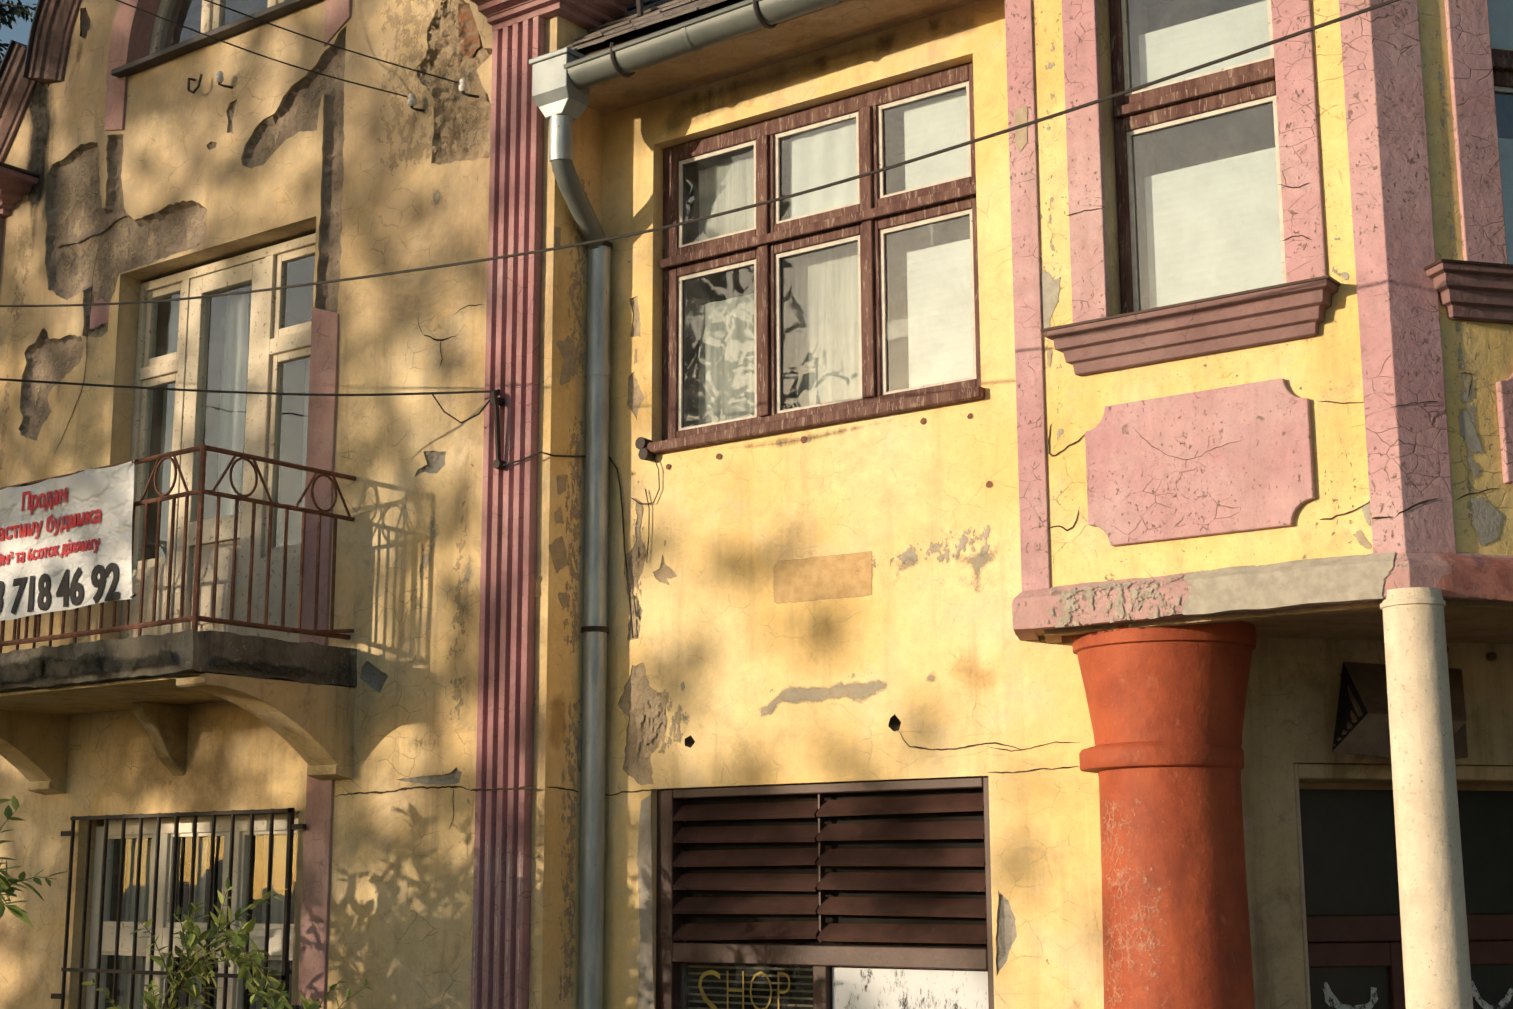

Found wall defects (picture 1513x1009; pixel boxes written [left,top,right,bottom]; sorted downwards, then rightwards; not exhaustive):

spalling [377,0,492,170]
spalling [206,26,346,313]
spalling [0,134,207,469]
peeling [627,296,644,419]
peeling [1436,322,1513,601]
peeling [624,481,677,641]
peeling [773,525,993,604]
peeling [1045,504,1395,628]
spalling [360,661,389,693]
peeling [617,663,695,1009]
crack [988,741,1079,774]
spalling [996,891,1017,975]